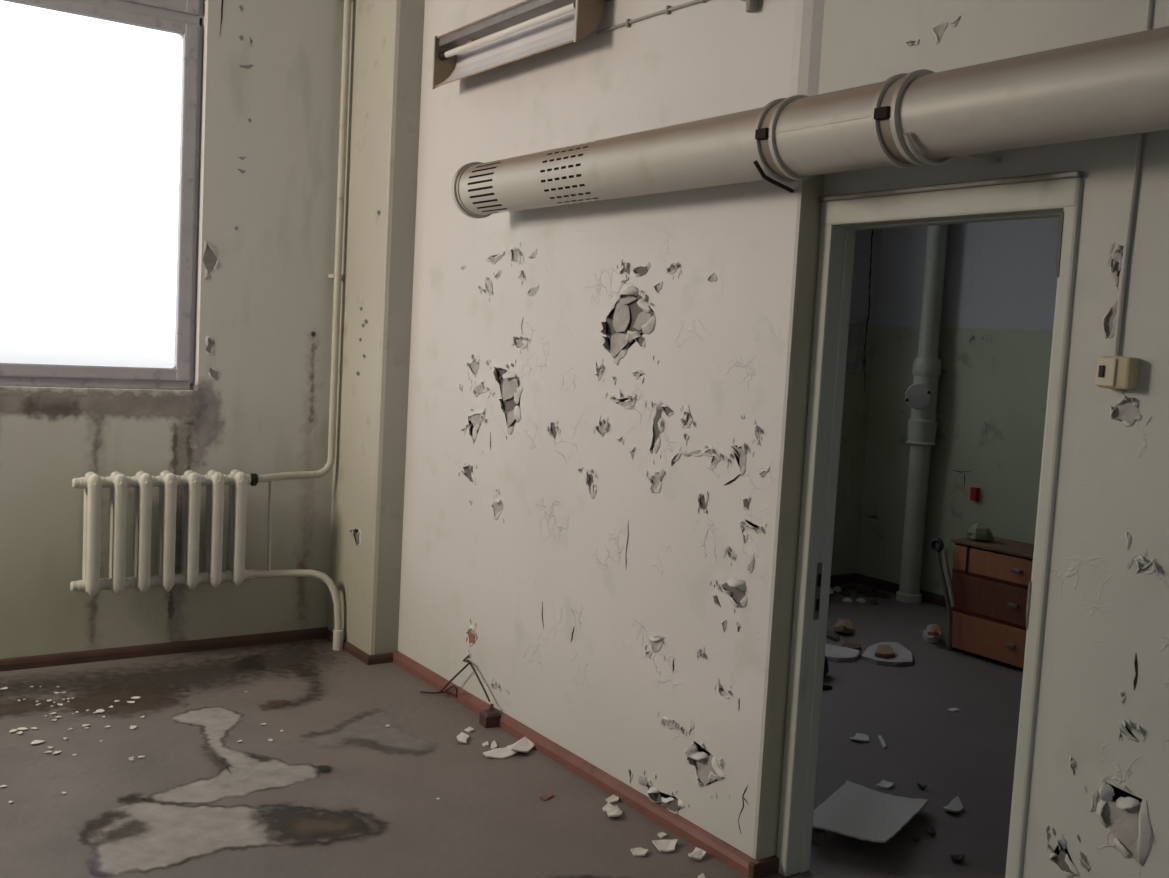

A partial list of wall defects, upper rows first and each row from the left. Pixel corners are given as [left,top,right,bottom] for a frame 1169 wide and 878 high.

peeling [594,259,763,493]
water stain [0,642,381,876]
water stain [309,707,430,752]
peeling [1084,769,1154,866]